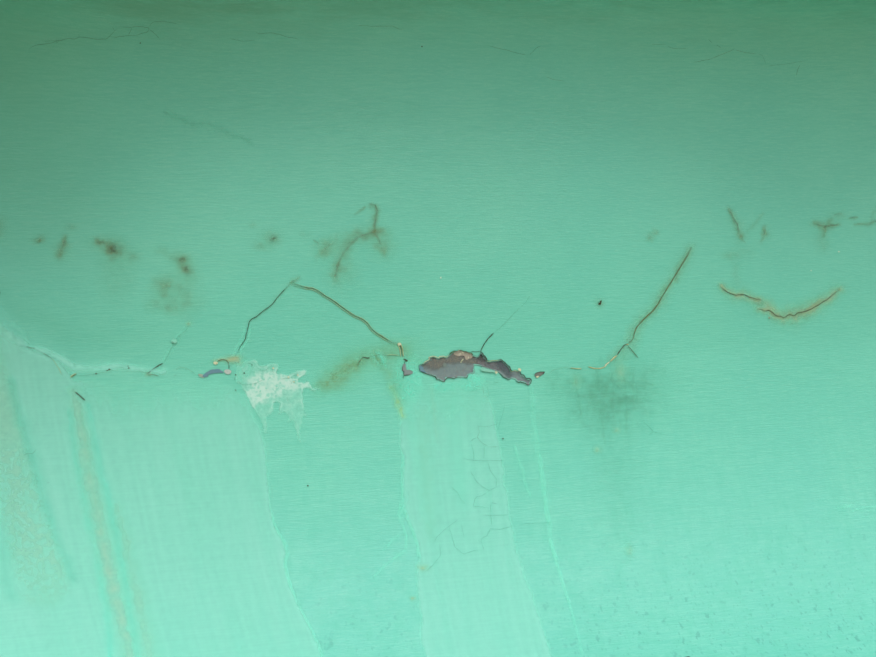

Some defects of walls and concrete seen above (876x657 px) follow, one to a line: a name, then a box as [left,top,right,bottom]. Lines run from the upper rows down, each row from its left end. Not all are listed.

crack [1,327,163,400]
crack [219,284,404,366]
peeling [402,350,545,385]
crack [571,253,689,369]
crack [720,284,840,320]
water stain [0,333,319,657]
water stain [401,408,551,657]